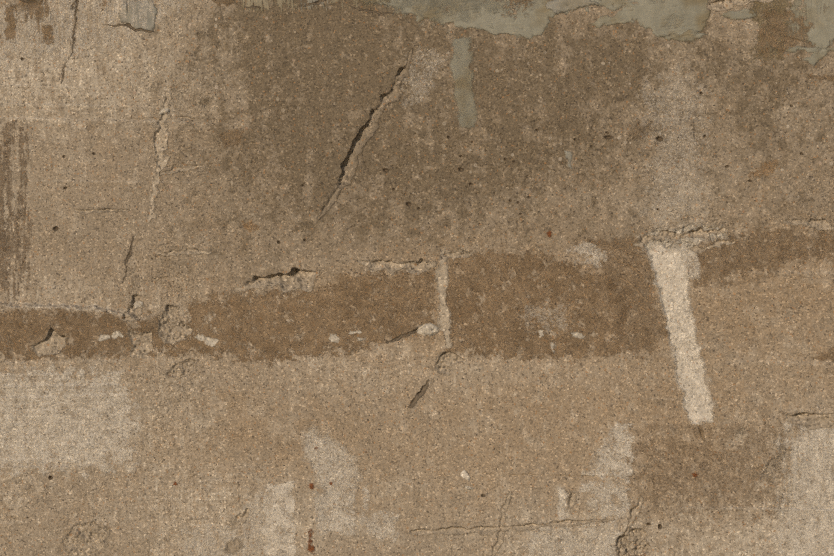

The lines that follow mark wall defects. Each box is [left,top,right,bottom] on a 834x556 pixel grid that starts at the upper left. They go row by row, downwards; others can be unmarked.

crack [61,0,78,83]
peeling [242,0,774,41]
peeling [781,0,834,65]
crack [783,218,834,230]
spalling [31,326,66,357]
spalling [233,267,320,293]
spalling [358,248,475,375]
spalling [633,222,735,425]
crack [407,379,429,408]
crack [491,491,512,556]